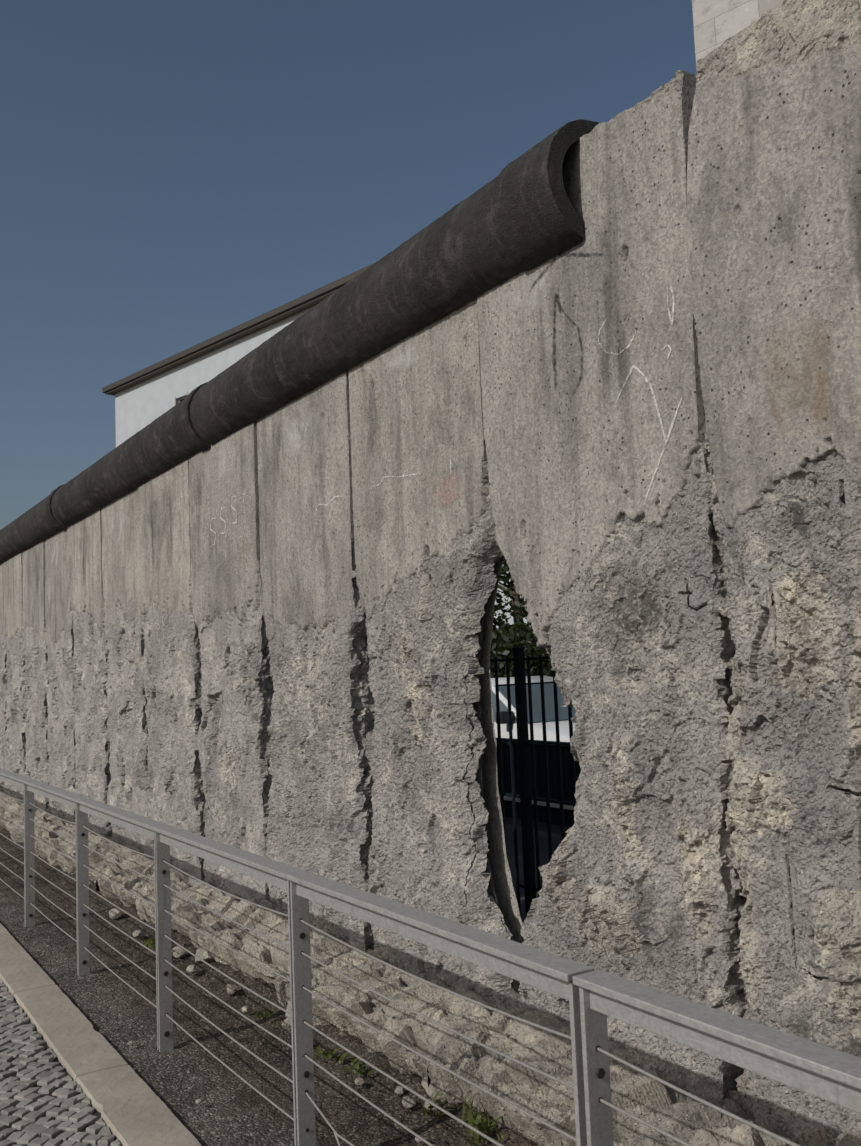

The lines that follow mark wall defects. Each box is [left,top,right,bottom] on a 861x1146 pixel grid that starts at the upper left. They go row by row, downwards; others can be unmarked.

spalling [0,457,509,937]
crack [462,672,476,904]
spalling [522,428,861,1058]
crack [681,582,706,611]
spalling [309,900,570,1022]
spalling [607,1016,861,1146]